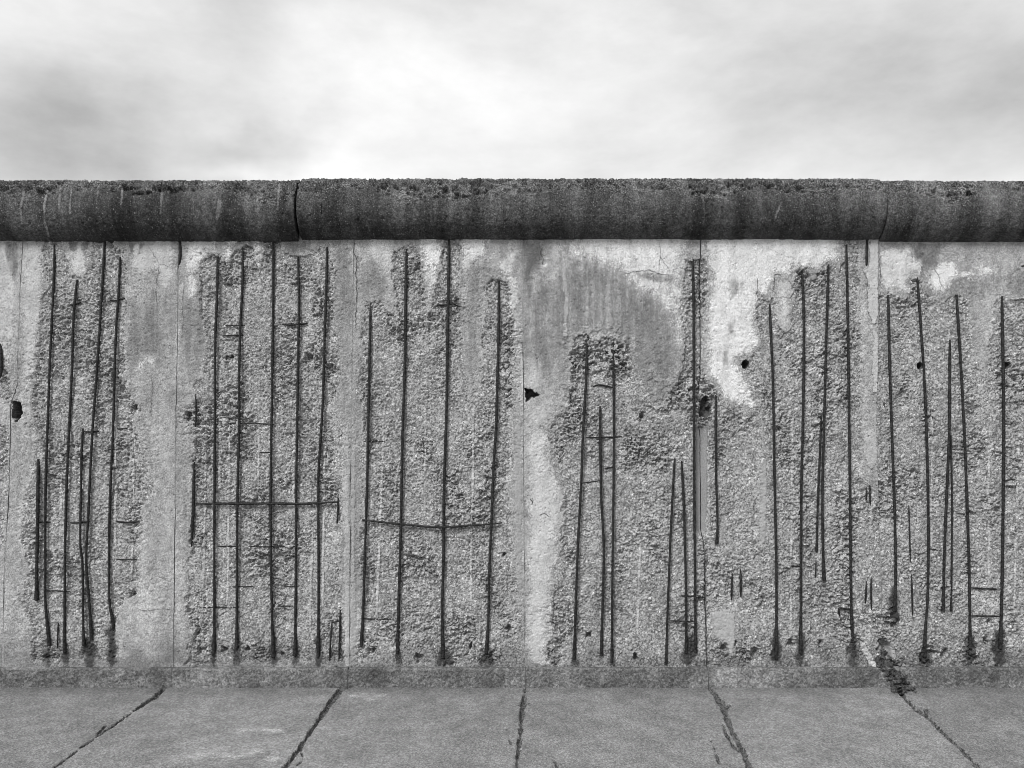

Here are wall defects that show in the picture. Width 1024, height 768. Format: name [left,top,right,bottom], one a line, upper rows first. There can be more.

damp [520,267,671,394]
spalling [0,239,1024,695]
crack [722,705,742,755]